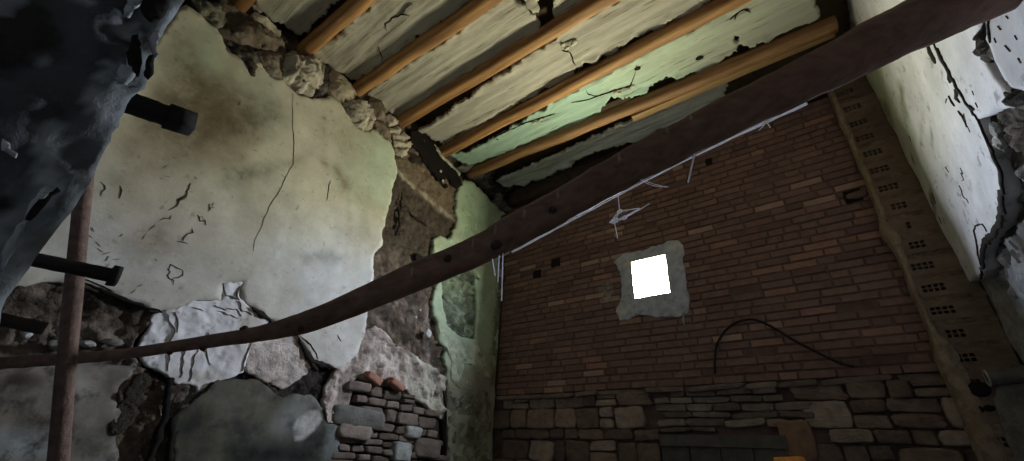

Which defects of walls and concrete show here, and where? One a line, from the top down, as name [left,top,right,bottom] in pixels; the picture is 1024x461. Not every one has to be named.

spalling [972,16,1021,64]
crack [254,100,295,243]
spalling [187,0,514,280]
crack [926,44,1007,279]
spalling [989,76,1024,299]
spalling [0,282,63,370]
spalling [78,271,490,461]